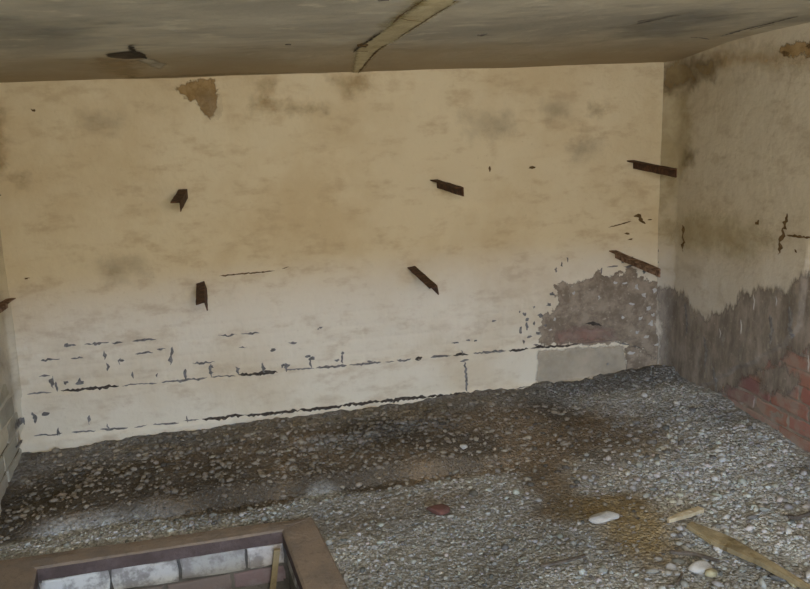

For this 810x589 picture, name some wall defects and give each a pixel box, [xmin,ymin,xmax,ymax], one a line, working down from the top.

spalling [105,46,165,68]
crack [354,0,456,73]
peeling [176,78,218,118]
peeling [519,261,659,383]
water stain [624,272,810,393]